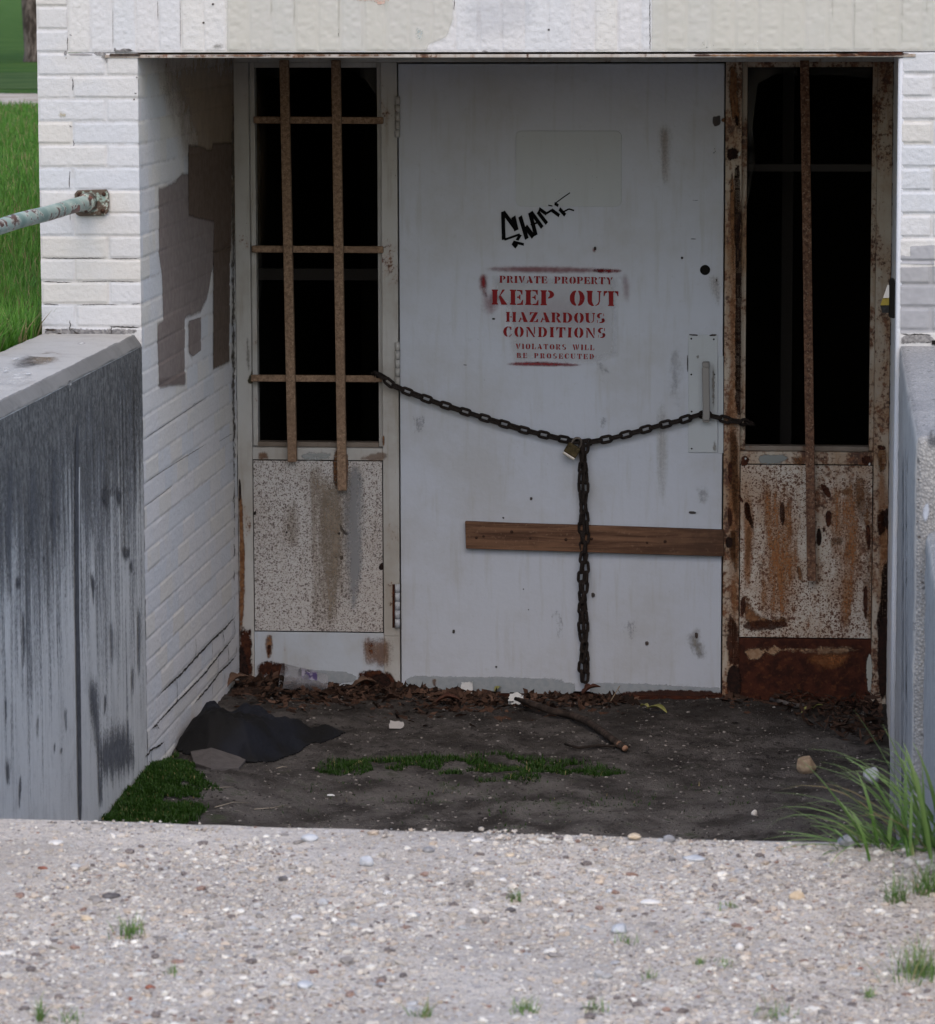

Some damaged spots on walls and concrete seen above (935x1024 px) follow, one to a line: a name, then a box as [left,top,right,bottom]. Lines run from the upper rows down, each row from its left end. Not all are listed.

damp [0,347,144,708]
damp [90,682,135,806]
corrosion [239,479,288,676]
corrosion [310,450,362,620]
corrosion [358,639,396,688]
corrosion [617,165,850,696]
corrosion [816,445,889,699]